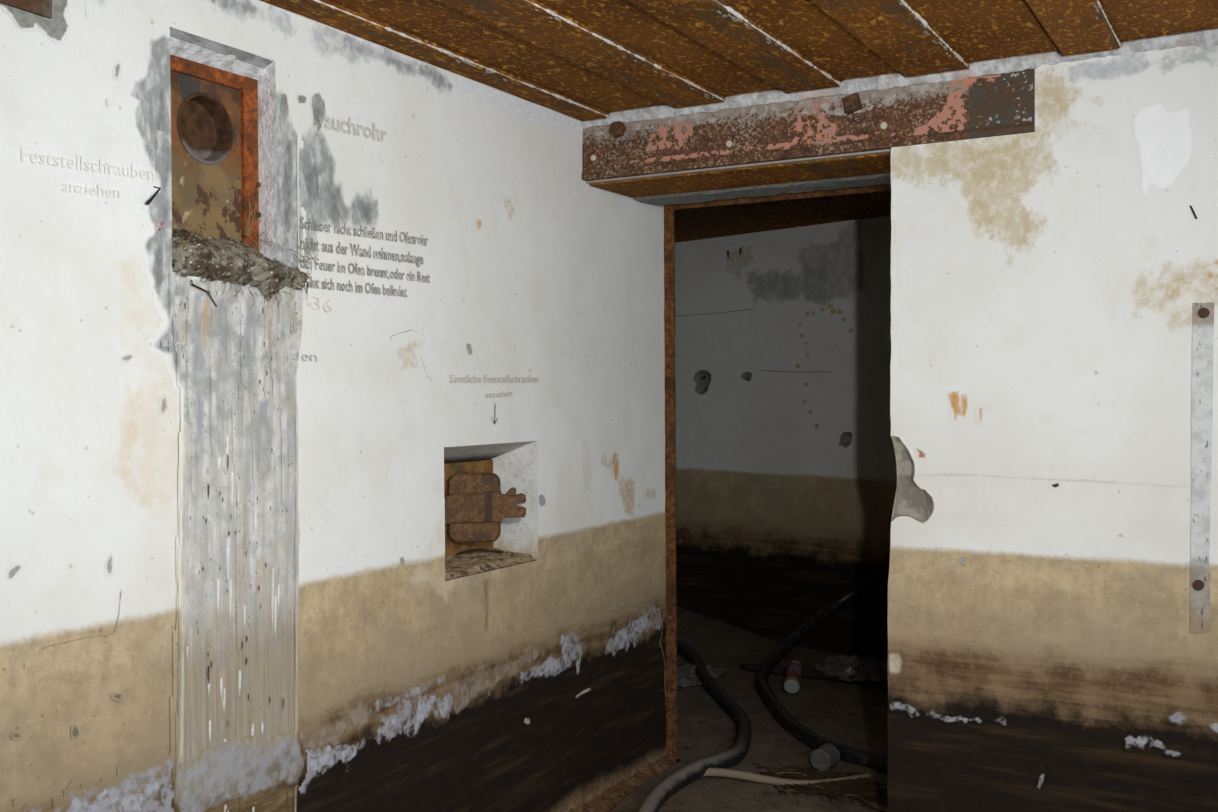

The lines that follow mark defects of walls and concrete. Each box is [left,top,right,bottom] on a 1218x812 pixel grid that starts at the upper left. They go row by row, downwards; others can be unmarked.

damp [684,218,877,316]
damp [891,0,1218,275]
damp [0,28,666,812]
spalling [891,436,937,523]
corrosion [944,389,985,425]
damp [676,463,1218,812]